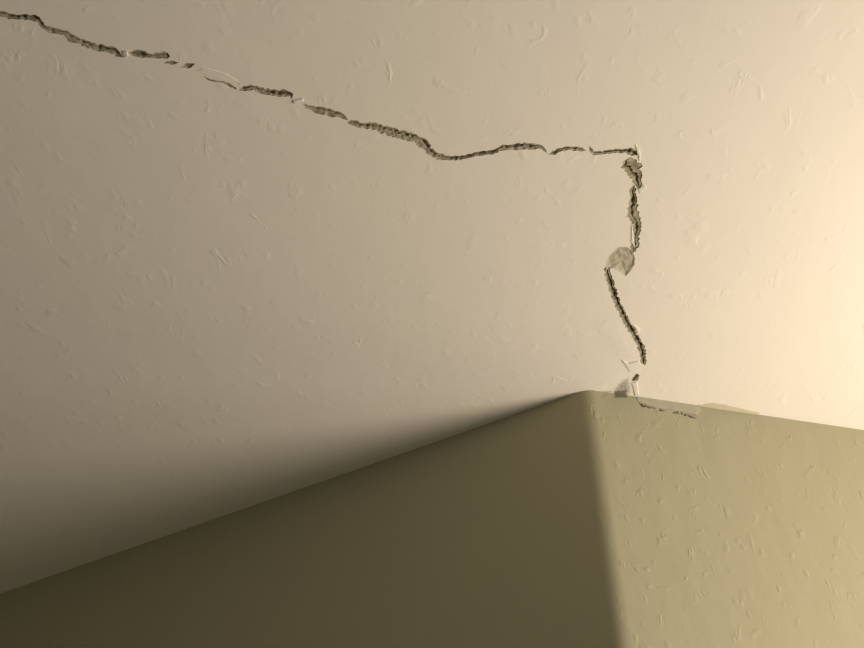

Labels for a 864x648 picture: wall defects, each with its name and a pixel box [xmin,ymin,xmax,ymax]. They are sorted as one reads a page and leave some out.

crack [0,11,647,253]
crack [603,267,647,396]